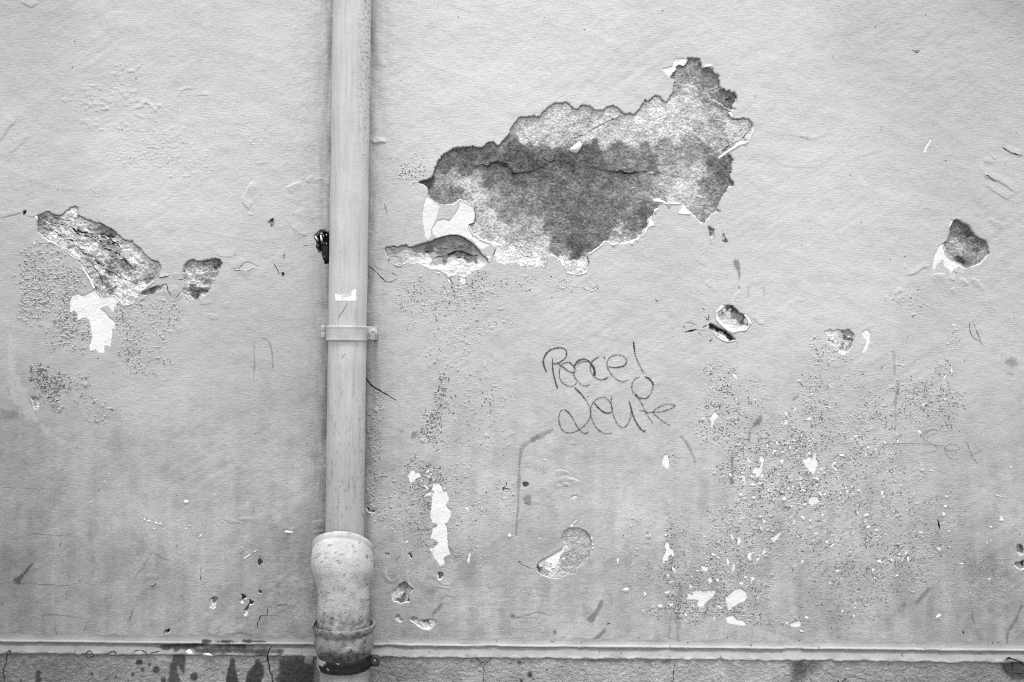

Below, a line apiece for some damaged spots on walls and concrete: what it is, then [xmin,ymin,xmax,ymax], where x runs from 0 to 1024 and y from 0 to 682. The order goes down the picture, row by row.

spalling [384,57,754,288]
spalling [932,219,990,273]
spalling [22,206,162,353]
spalling [181,257,223,302]
spalling [708,304,752,343]
spalling [824,329,870,355]
peeling [729,440,826,522]
peeling [425,483,451,580]
spalling [536,521,594,579]
peeling [662,534,673,561]
peeling [730,531,782,564]
peeling [687,554,755,625]